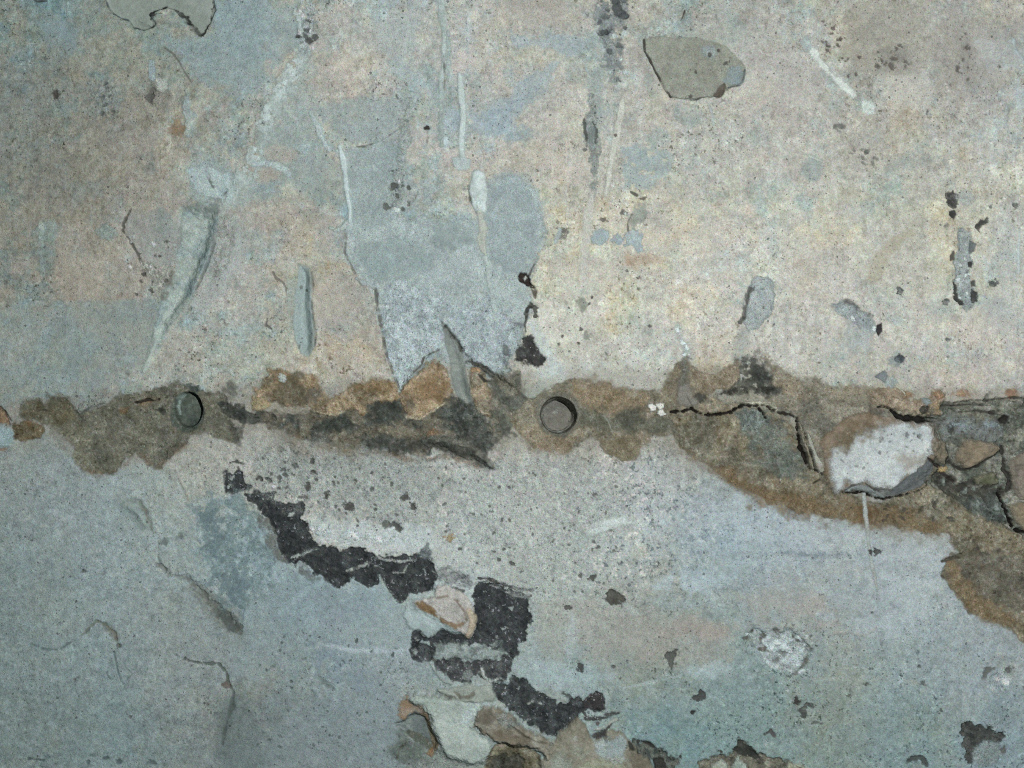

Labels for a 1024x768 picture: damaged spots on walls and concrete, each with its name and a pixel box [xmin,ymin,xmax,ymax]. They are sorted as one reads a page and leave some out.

spalling [329,130,568,392]
damp [223,460,619,743]
spalling [249,444,639,616]
flaking render [414,585,477,638]
damp [18,323,1024,642]
crack [670,397,1024,533]
flaking render [820,354,1024,537]
spalling [383,694,681,768]
spalling [691,689,706,715]